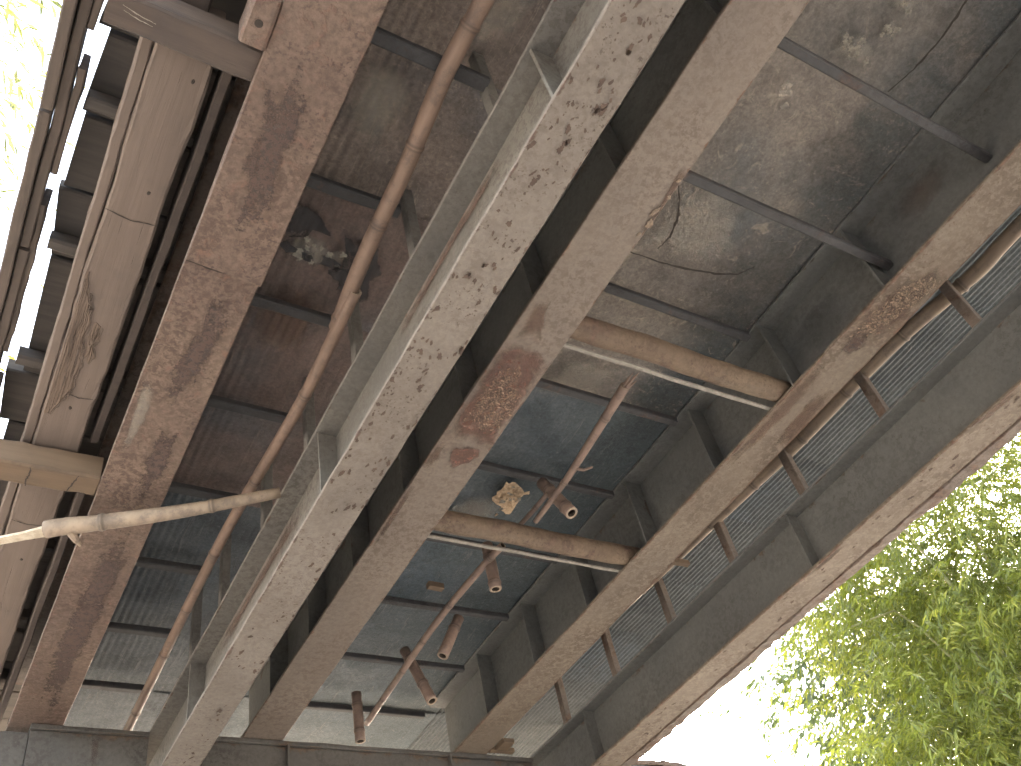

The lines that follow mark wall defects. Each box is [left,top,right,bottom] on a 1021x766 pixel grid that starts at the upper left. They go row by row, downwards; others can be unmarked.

crack [888,0,968,92]
peeling [280,236,347,284]
crack [630,185,755,275]
corrosion [450,348,545,468]